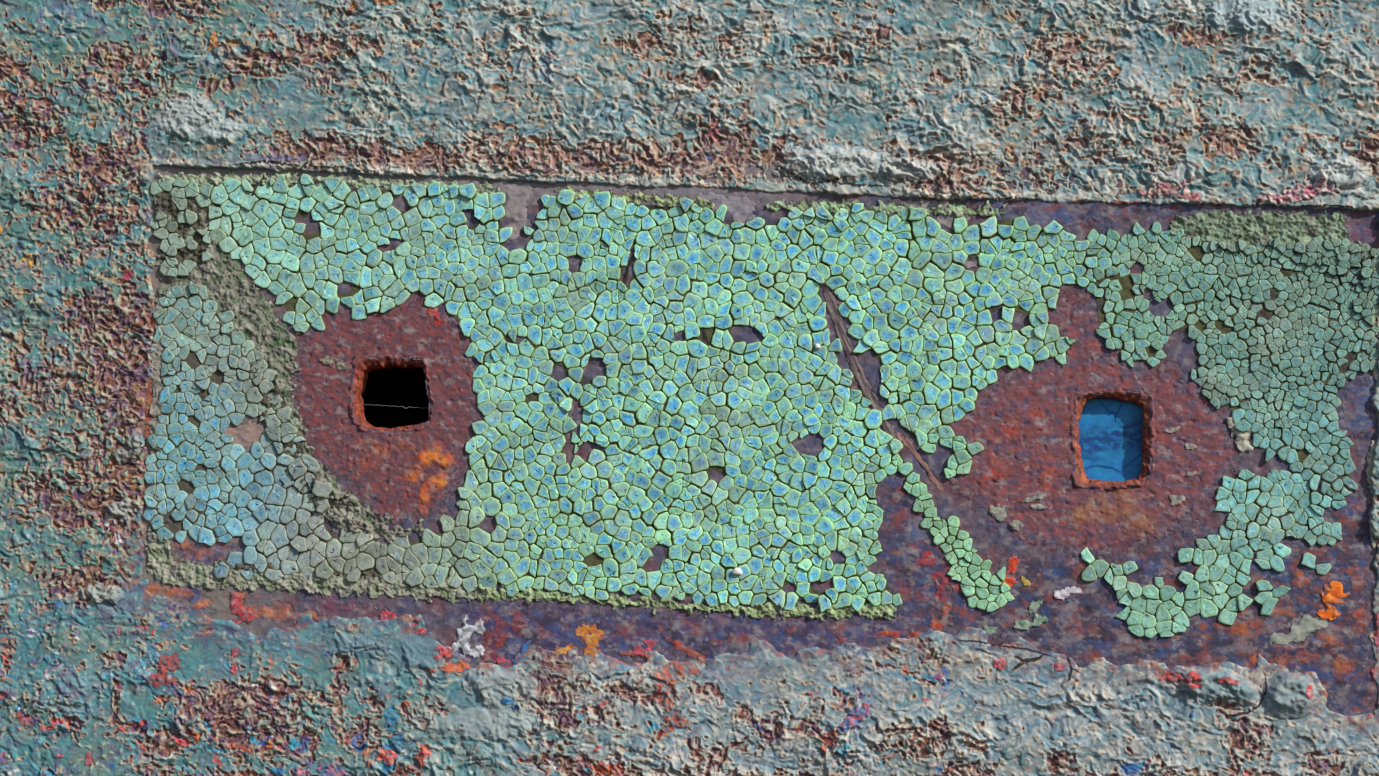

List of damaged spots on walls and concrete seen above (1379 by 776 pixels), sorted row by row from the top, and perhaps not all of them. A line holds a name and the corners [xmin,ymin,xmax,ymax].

crack [223,156,370,215]
crack [773,163,943,200]
crack [1243,203,1359,211]
crack [624,256,633,283]
crack [701,327,713,358]
rust [292,293,481,530]
peeling [143,174,1379,638]
rust [942,289,1240,588]
rust [663,635,706,659]
rust [867,550,967,693]
rust [1191,564,1371,682]
rust [869,714,1003,776]